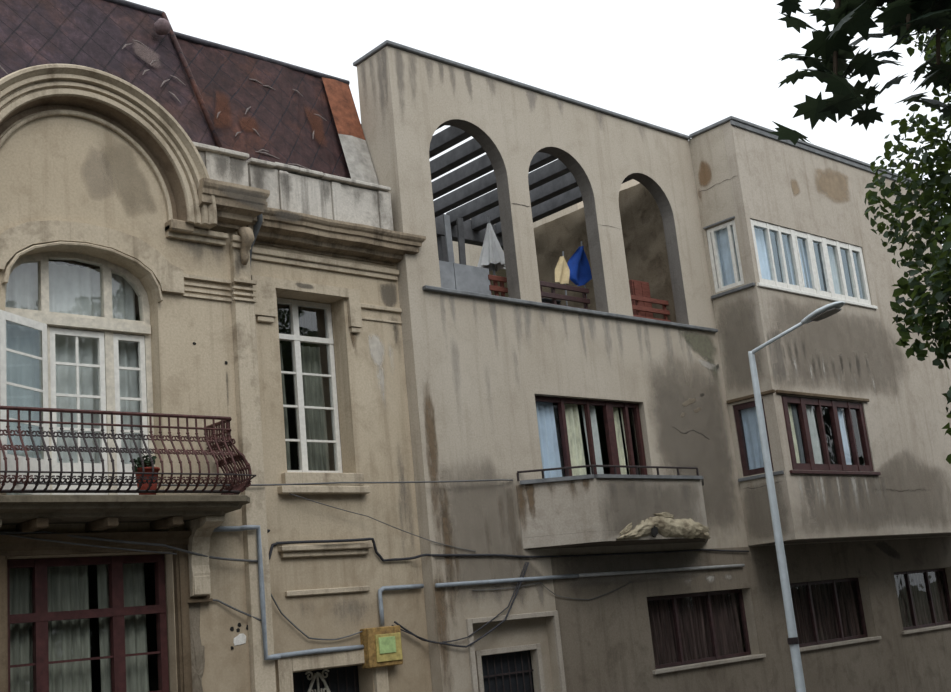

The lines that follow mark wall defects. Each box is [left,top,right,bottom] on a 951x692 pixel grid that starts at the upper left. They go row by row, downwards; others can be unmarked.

water stain [425,396,457,670]
water stain [507,484,535,522]